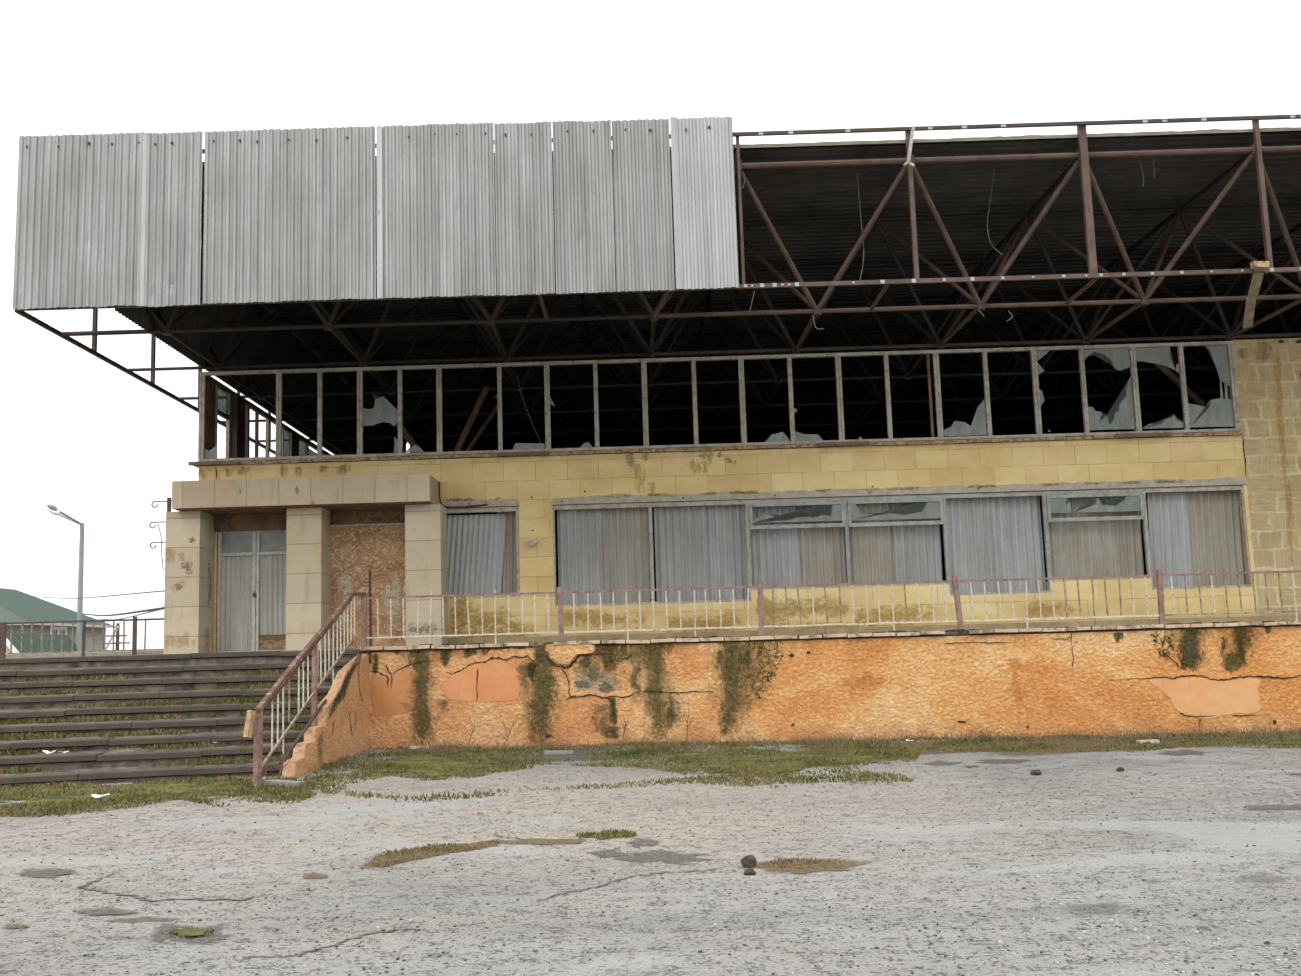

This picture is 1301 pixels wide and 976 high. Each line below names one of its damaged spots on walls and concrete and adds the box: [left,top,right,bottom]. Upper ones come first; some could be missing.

crack [1108,636,1301,681]
water stain [1221,638,1242,672]
crack [332,646,713,736]
water stain [630,666,680,721]